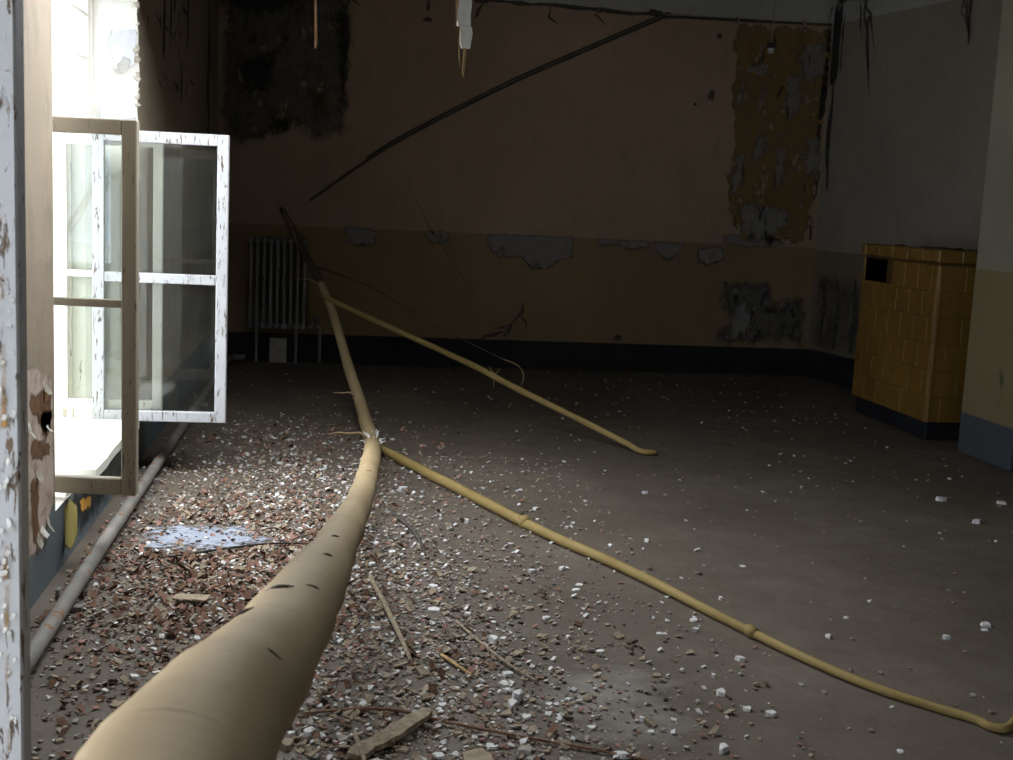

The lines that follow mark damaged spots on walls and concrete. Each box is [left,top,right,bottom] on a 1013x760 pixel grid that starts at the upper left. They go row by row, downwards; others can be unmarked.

peeling [108,0,194,119]
water stain [814,277,861,354]
flaking render [0,366,91,559]
peeling [0,518,15,583]